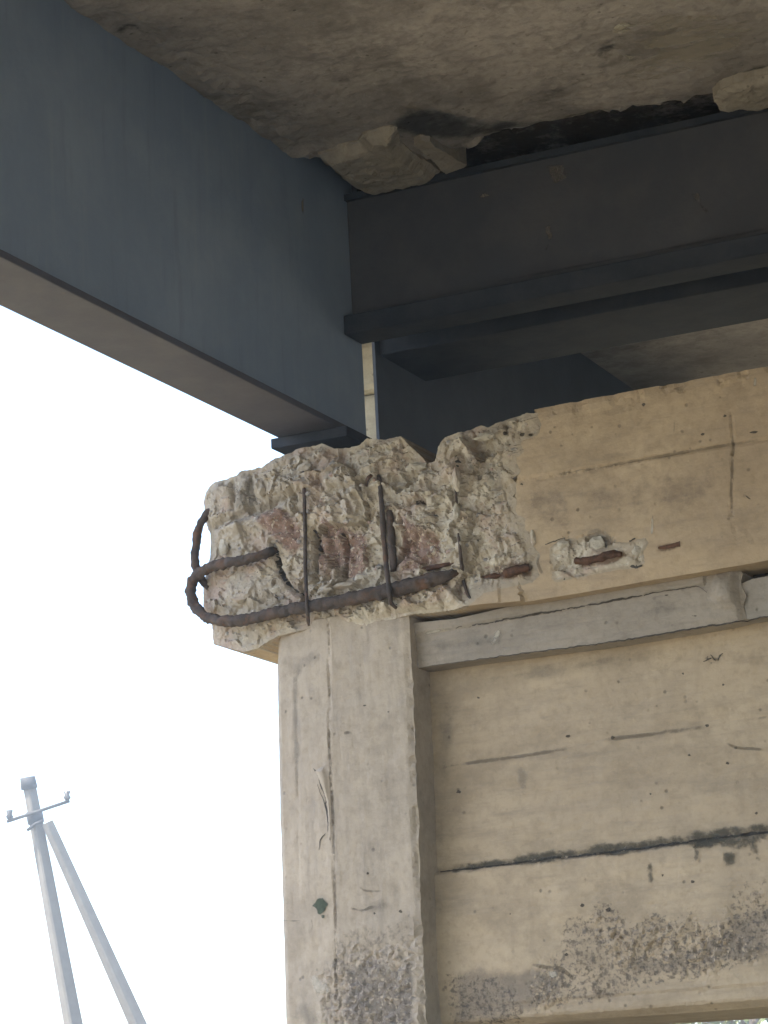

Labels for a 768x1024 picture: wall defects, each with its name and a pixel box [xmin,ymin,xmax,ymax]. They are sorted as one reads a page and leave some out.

spalling [318,124,467,195]
rust [260,508,300,551]
rust [318,520,369,579]
rust [402,519,440,570]
spalling [184,413,680,665]
crack [440,831,768,872]